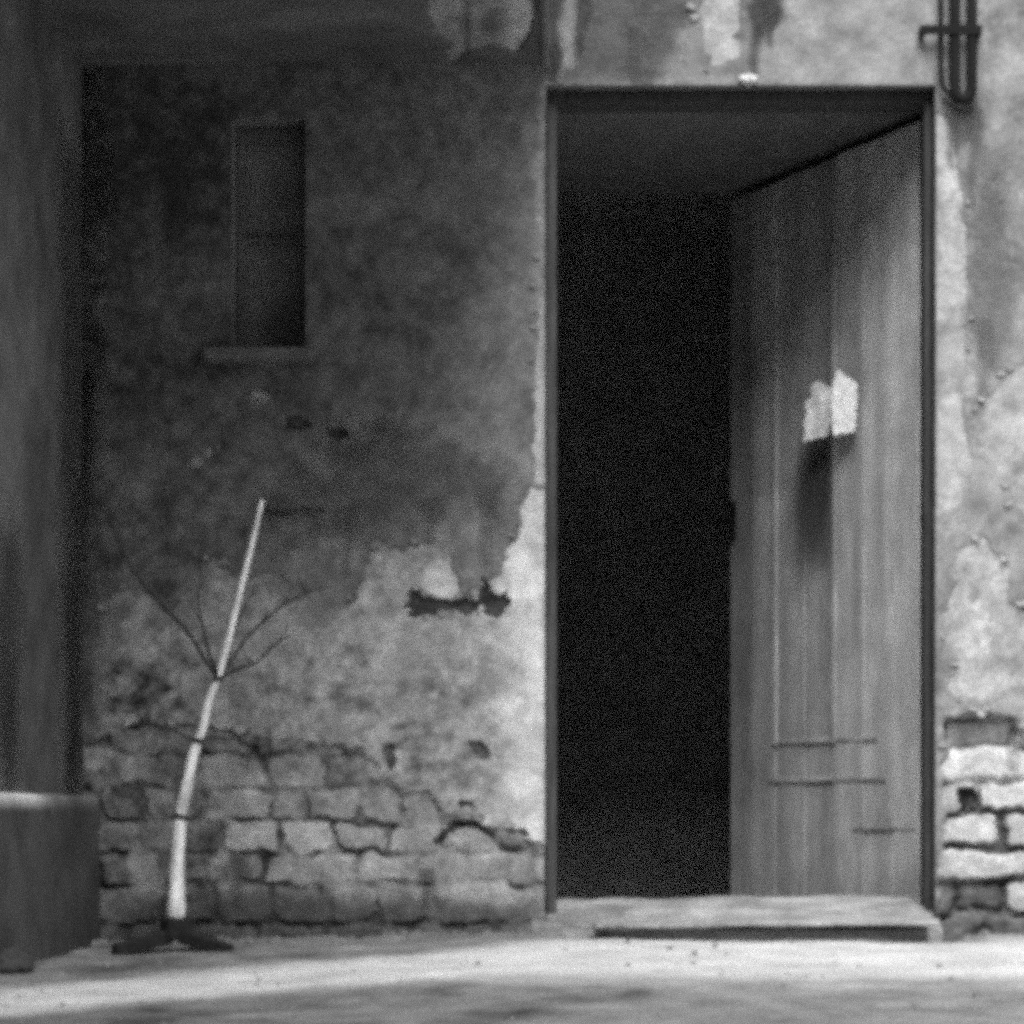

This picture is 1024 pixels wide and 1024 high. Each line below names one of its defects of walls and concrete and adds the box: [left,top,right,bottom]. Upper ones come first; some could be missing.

spalling [427,0,533,60]
peeling [83,115,545,942]
spalling [935,533,1024,943]